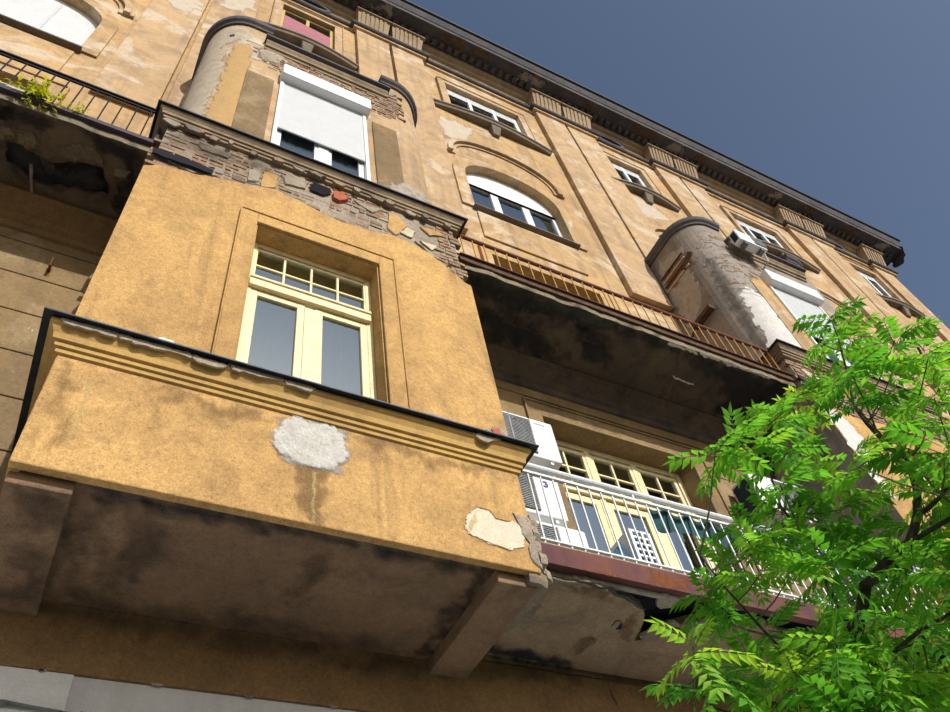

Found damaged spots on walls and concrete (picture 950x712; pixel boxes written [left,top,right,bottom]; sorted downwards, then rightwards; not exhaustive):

flaking render [181,27,406,123]
spalling [0,127,131,194]
flaking render [144,116,473,286]
damp [471,277,634,362]
flaking render [659,246,702,335]
flaking render [739,286,802,348]
damp [643,334,789,422]
damp [758,428,777,479]
spalling [464,506,553,631]
spalling [590,578,721,642]